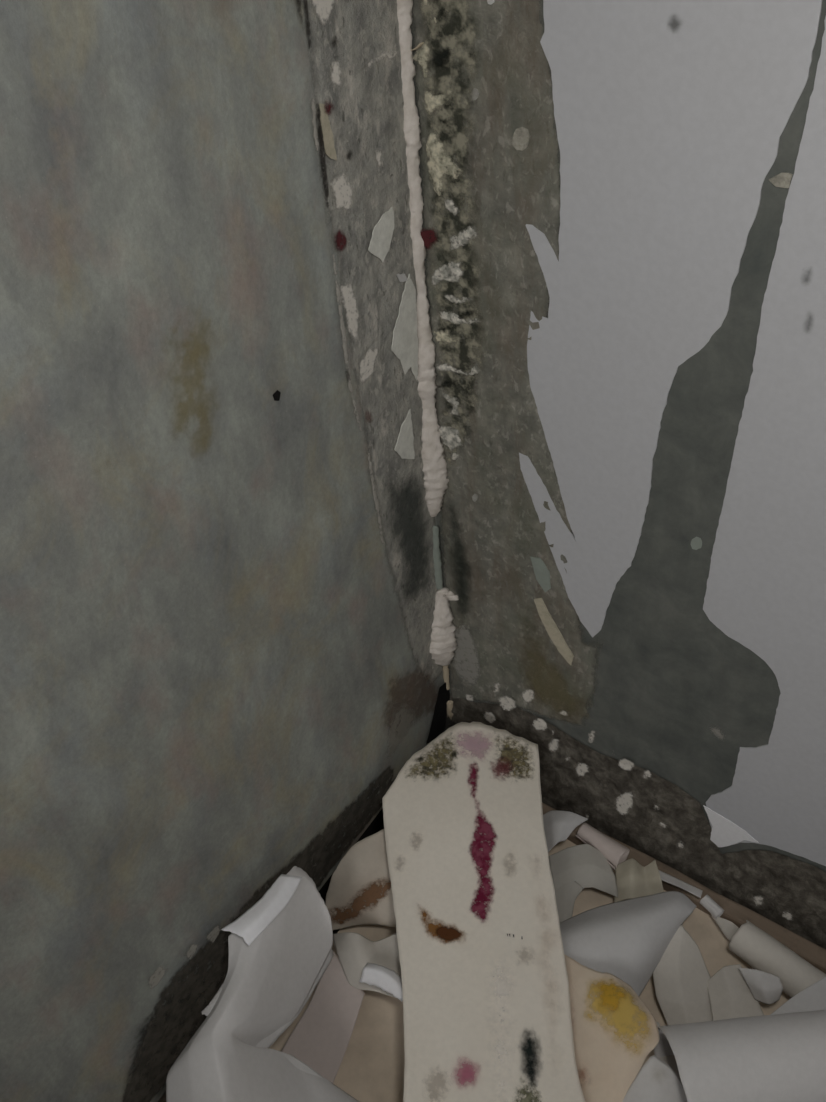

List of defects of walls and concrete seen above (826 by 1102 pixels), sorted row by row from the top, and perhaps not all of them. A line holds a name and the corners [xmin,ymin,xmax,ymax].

water stain [413,0,482,464]
water stain [392,482,428,596]
peeling [296,0,826,949]